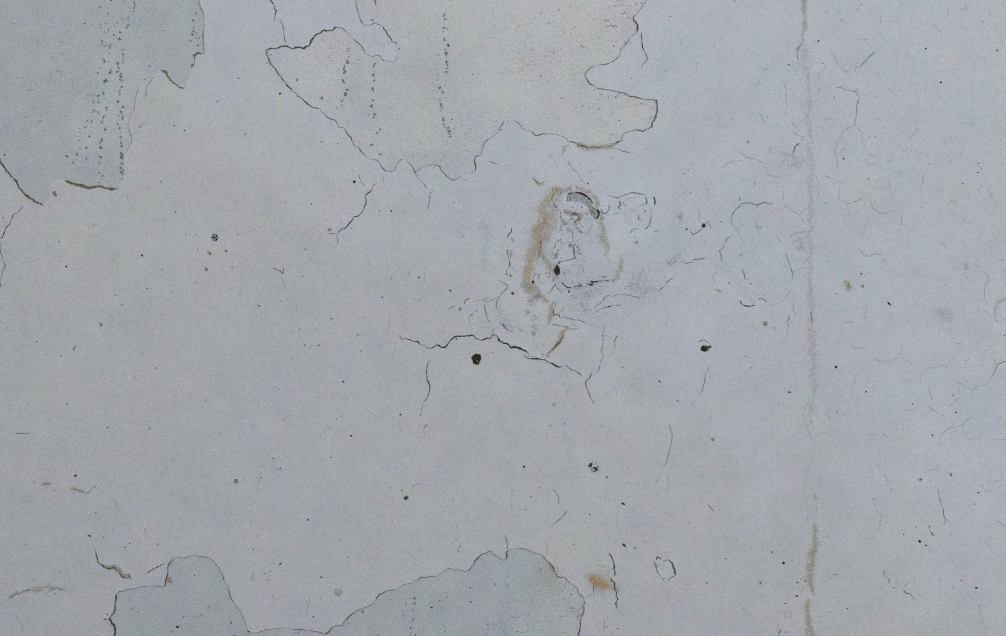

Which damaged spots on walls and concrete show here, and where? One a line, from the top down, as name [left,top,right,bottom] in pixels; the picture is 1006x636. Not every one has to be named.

peeling [0,0,204,207]
peeling [263,0,661,181]
crack [363,5,928,438]
crack [803,305,1006,551]
peeling [105,547,589,636]